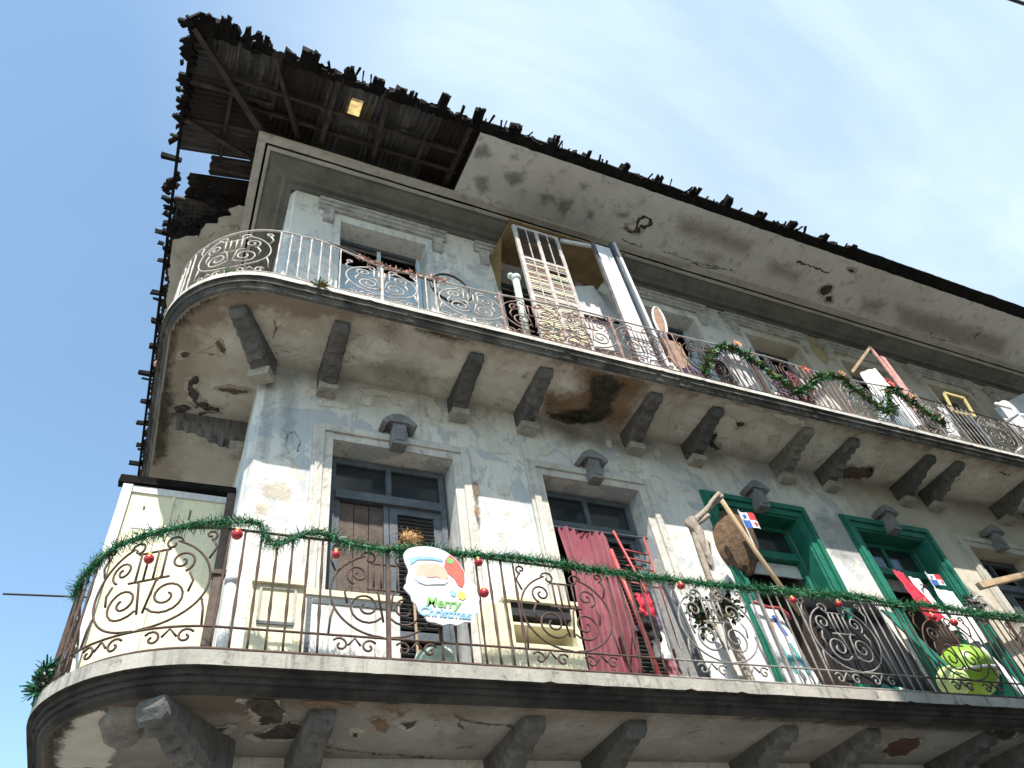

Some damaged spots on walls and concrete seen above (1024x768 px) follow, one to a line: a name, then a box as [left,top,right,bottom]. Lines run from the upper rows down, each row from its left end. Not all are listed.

spalling [816,283,835,304]
spalling [175,338,226,361]
spalling [167,373,252,414]
water stain [547,374,623,424]
spalling [842,464,875,481]
spalling [214,699,301,742]
spalling [881,735,925,759]